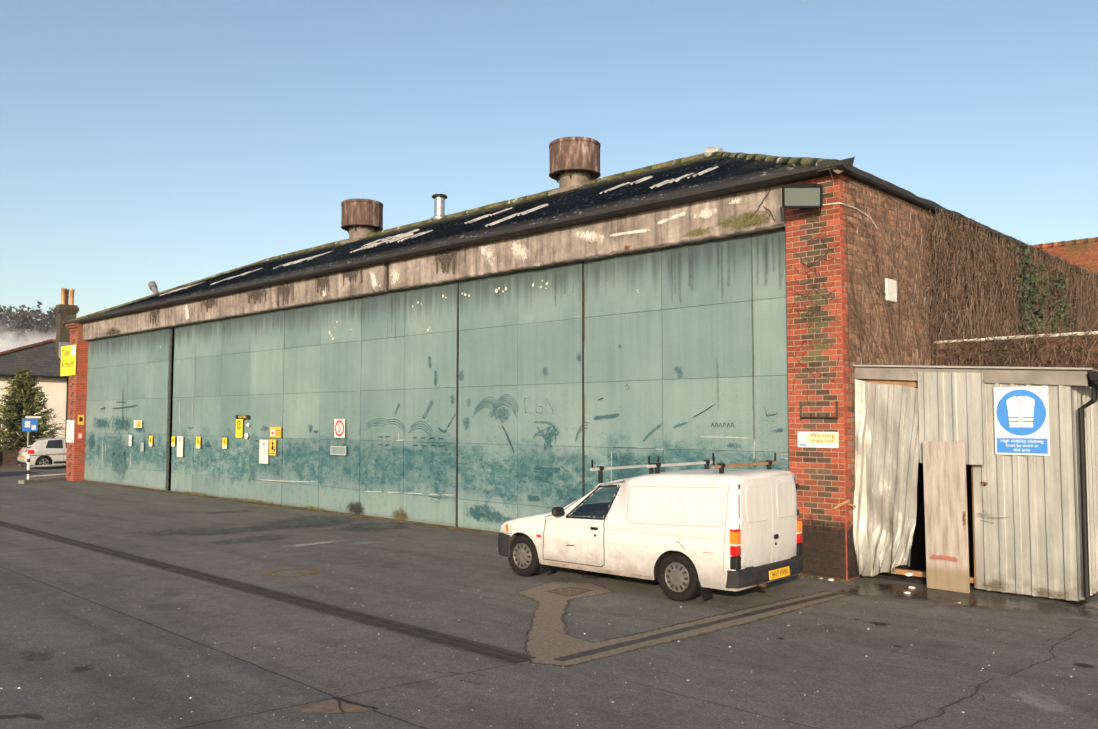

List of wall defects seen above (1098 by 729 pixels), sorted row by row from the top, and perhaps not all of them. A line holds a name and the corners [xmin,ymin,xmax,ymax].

leakage [365,414,455,447]
crack [901,628,1080,729]